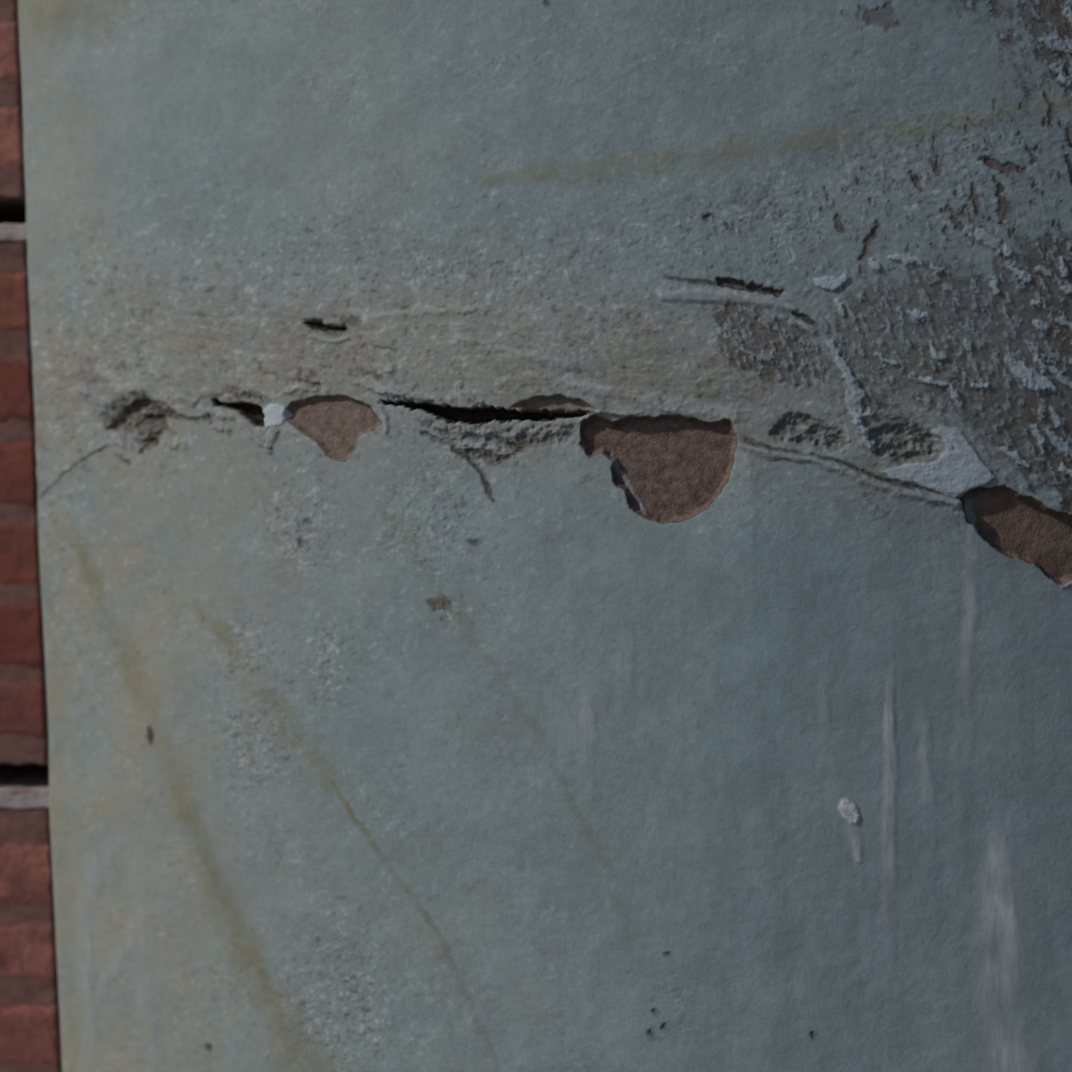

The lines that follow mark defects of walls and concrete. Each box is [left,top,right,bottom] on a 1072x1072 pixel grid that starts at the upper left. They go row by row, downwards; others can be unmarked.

peeling [1001,0,1072,96]
peeling [1043,93,1072,183]
peeling [717,146,1072,586]
crack [42,385,274,495]
spalling [263,395,387,461]
crack [366,382,593,502]
spalling [580,410,738,524]
crack [744,439,959,498]